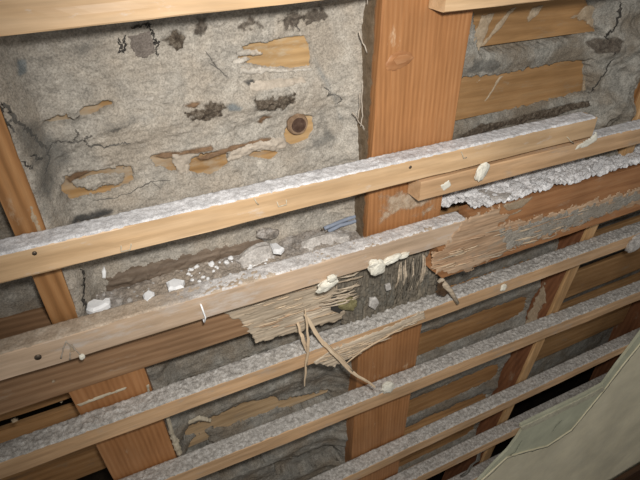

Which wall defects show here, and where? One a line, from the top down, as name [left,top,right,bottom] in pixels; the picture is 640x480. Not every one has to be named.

flaking render [238,6,328,123]
crack [591,2,623,92]
crack [0,102,131,173]
flaking render [45,100,112,122]
flaking render [61,165,133,199]
flaking render [150,151,228,174]
flaking render [102,239,284,292]